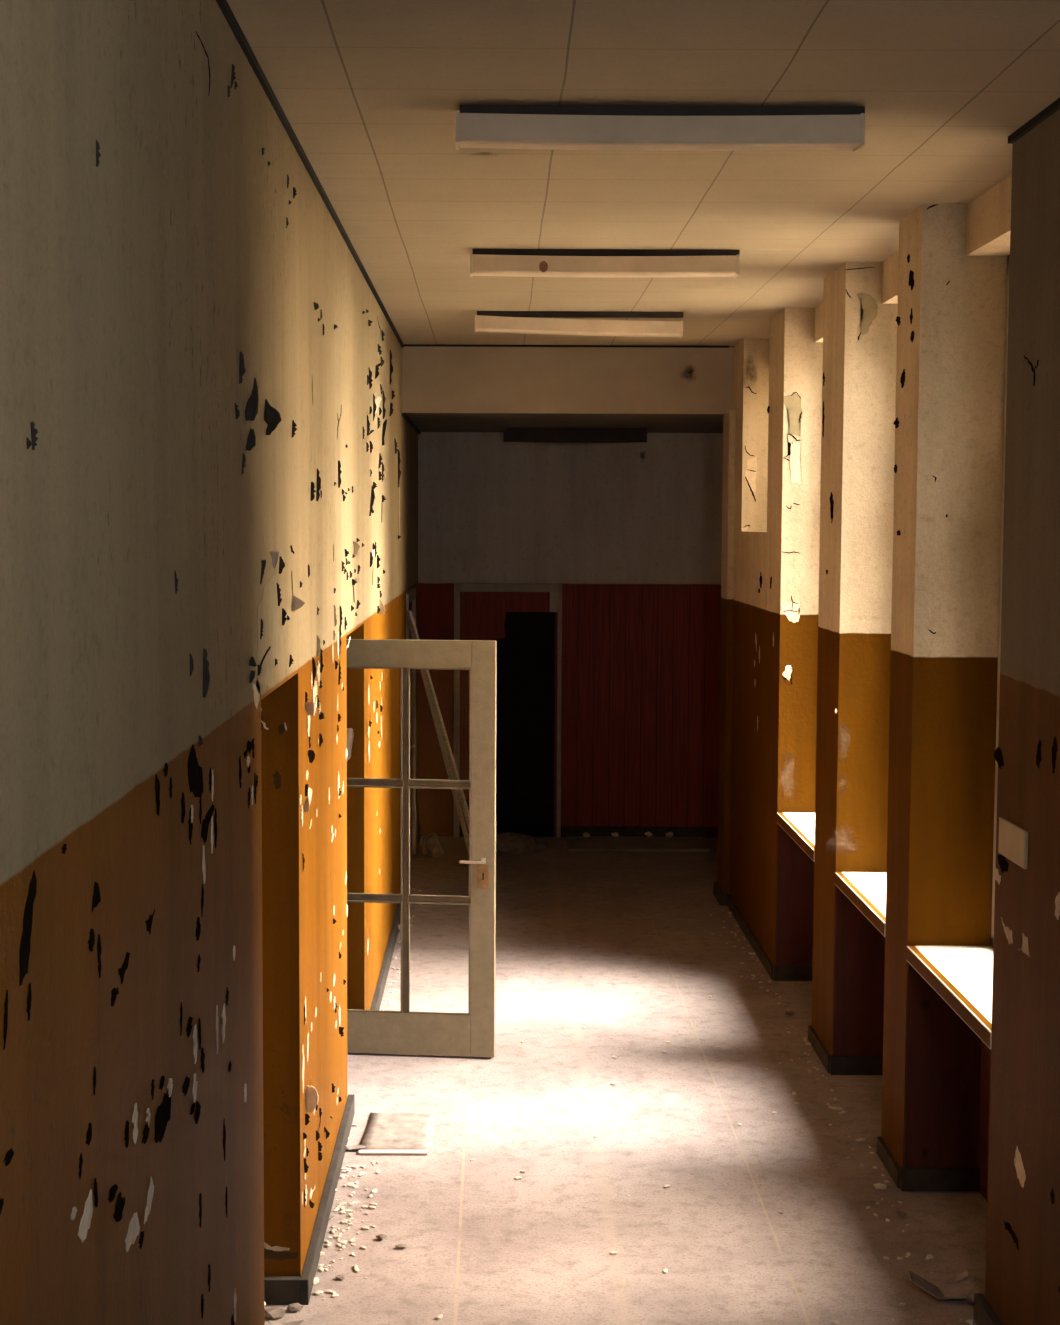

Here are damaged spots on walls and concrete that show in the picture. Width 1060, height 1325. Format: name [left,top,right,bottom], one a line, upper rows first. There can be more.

peeling [235,352,297,475]
peeling [363,309,401,539]
peeling [767,392,803,441]
peeling [311,445,354,501]
peeling [239,538,385,842]
peeling [1036,737,1058,773]
peeling [994,854,1009,885]
peeling [1001,917,1031,958]
peeling [302,904,348,1093]
peeling [302,1083,342,1208]
peeling [1014,1147,1026,1188]